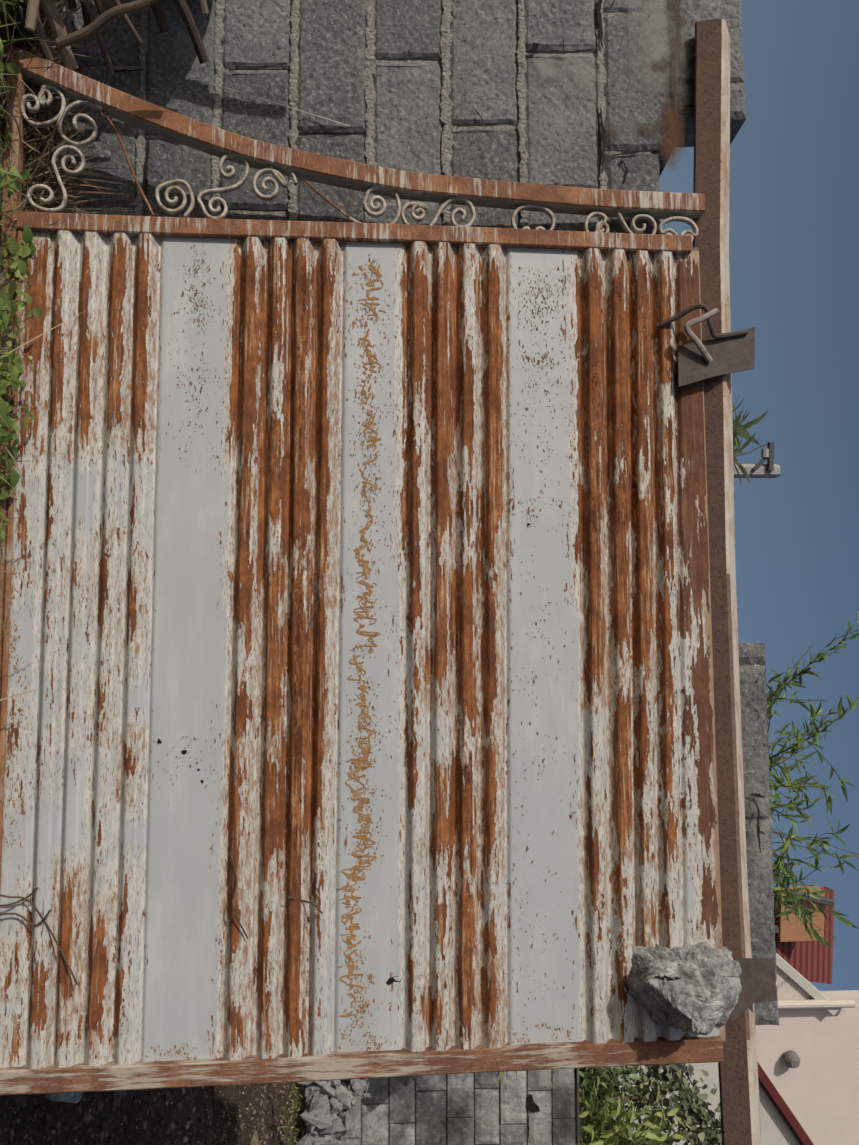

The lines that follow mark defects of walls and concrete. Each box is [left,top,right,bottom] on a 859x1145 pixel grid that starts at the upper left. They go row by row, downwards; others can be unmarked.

rust [0,230,162,1065]
rust [208,236,521,1059]
peeling [339,907,396,1051]
peeling [339,677,399,890]
peeling [338,254,402,642]
rust [557,247,721,1043]